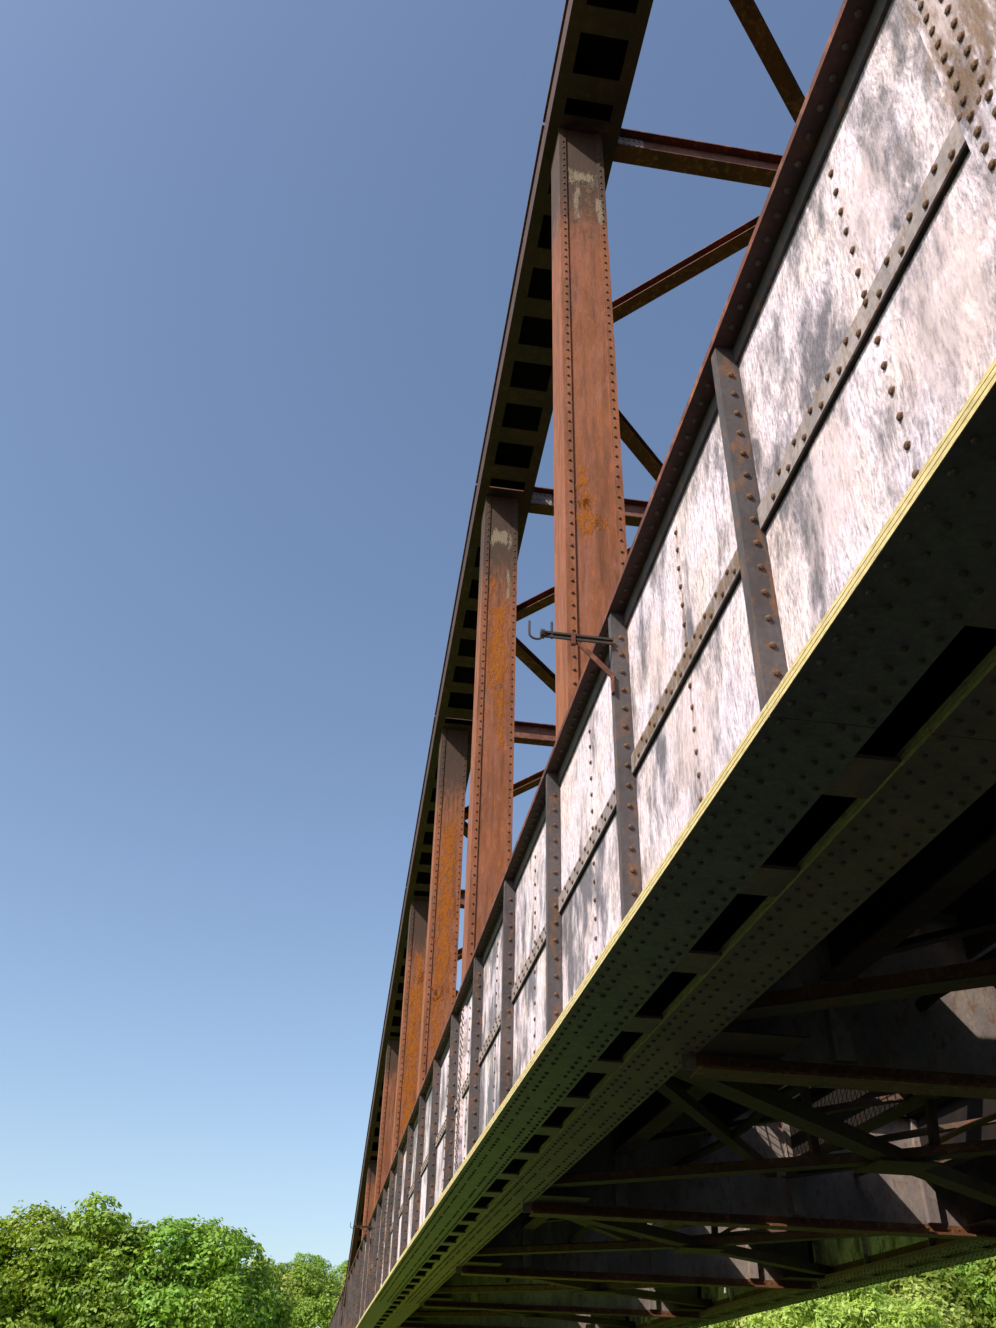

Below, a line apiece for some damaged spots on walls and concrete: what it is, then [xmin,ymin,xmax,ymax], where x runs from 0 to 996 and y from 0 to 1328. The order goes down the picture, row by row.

corrosion [575,466,607,534]
corrosion [485,578,508,748]
corrosion [400,819,458,1138]